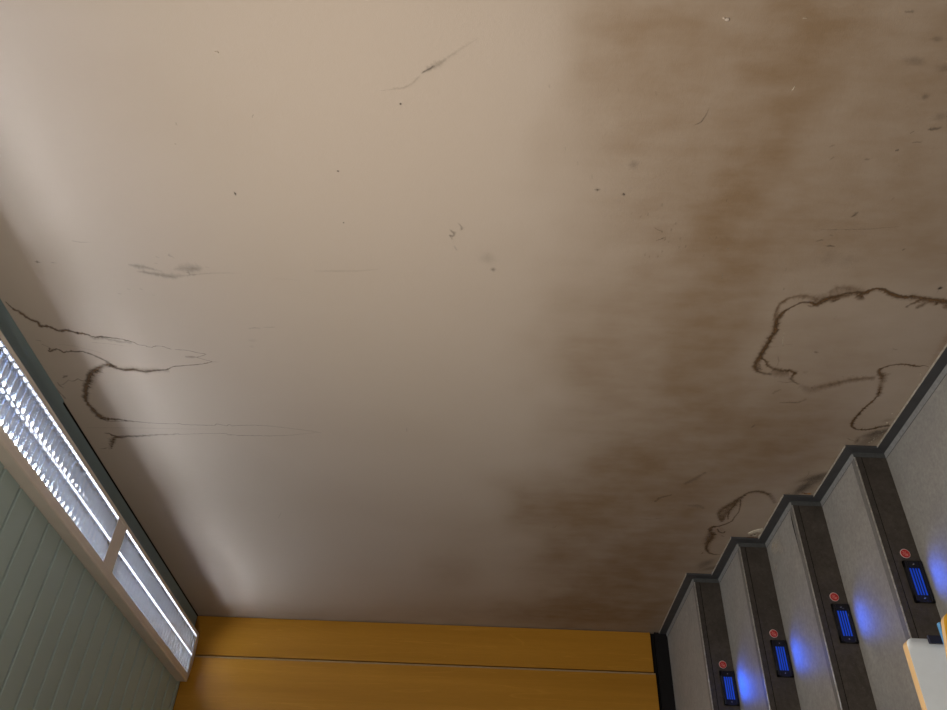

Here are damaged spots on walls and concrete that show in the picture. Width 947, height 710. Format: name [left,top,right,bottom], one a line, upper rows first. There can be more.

leakage [753,288,947,380]
leakage [850,364,923,430]